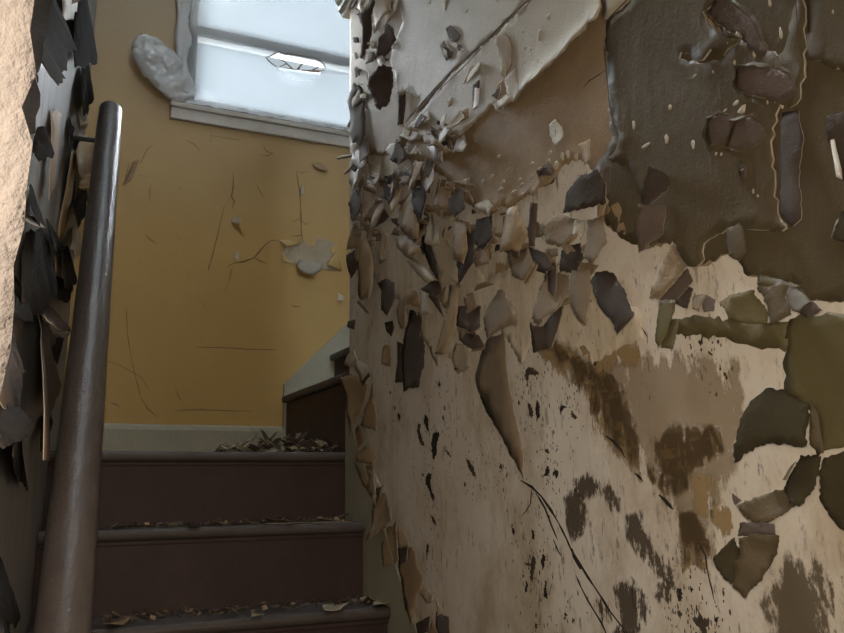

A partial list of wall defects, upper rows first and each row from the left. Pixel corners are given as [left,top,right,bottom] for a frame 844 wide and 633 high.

peeling [708,0,769,55]
peeling [0,0,98,491]
crack [208,171,308,292]
peeling [633,165,670,253]
peeling [727,223,747,261]
peeling [780,109,804,227]
peeling [826,111,844,180]
peeling [279,0,635,633]
peeling [649,241,823,380]
damp [539,340,744,633]
peeling [0,557,20,633]
damp [760,555,836,633]